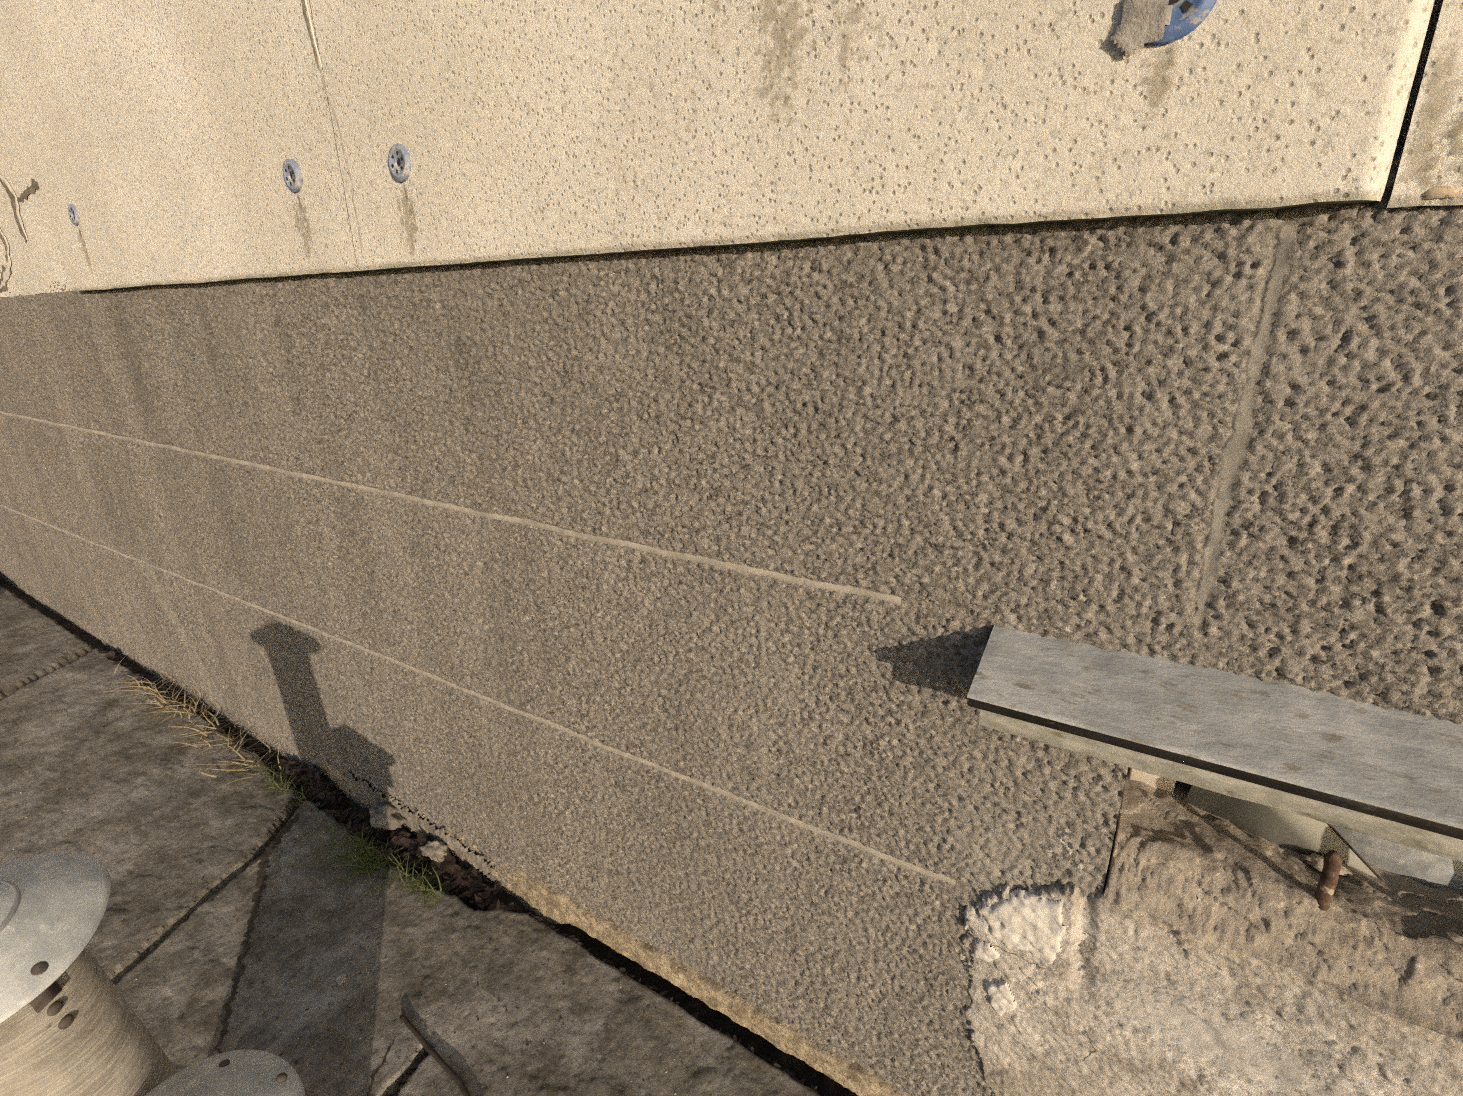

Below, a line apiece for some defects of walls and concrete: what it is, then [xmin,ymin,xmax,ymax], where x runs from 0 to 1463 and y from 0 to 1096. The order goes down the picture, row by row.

crack [0,175,44,293]
crack [301,0,362,252]